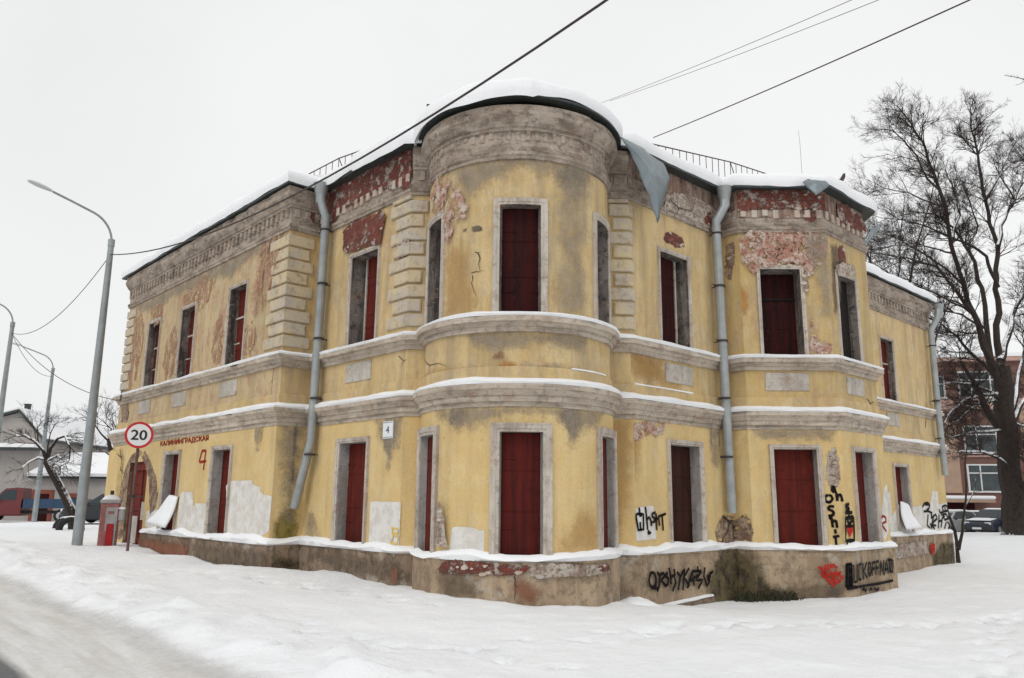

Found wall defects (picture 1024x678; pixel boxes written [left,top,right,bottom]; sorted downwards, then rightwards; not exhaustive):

flaking render [311,149,412,253]
flaking render [430,175,482,246]
flaking render [664,192,717,231]
flaking render [664,231,684,248]
flaking render [724,190,866,292]
flaking render [825,447,841,488]
flaking render [438,559,610,579]